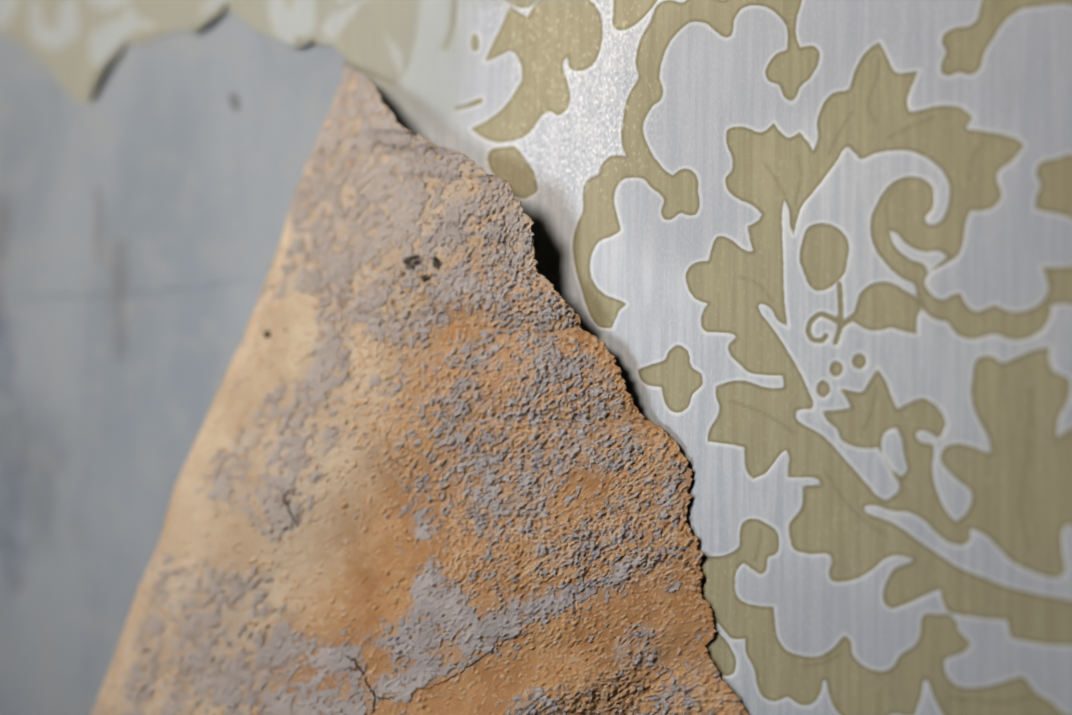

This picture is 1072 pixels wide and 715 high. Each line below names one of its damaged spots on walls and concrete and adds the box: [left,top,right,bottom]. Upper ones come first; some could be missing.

flaking render [0,9,654,715]
flaking render [654,458,685,508]
flaking render [648,677,701,715]